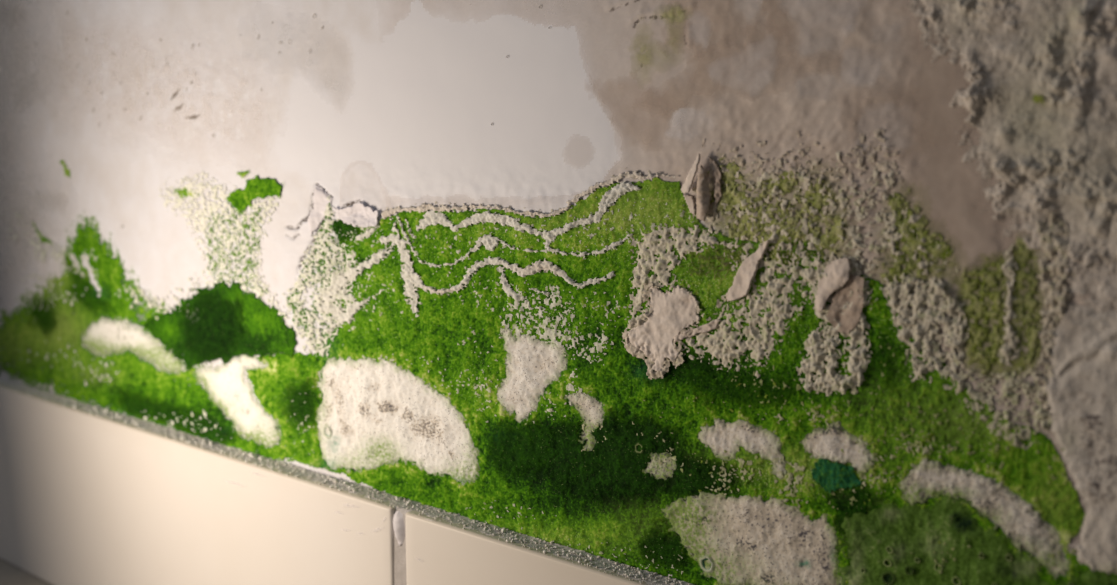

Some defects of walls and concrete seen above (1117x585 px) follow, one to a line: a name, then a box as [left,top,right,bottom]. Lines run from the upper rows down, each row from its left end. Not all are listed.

damp [18,318,133,386]
peeling [307,185,379,236]
damp [115,0,1096,513]
flaking render [622,0,1117,585]